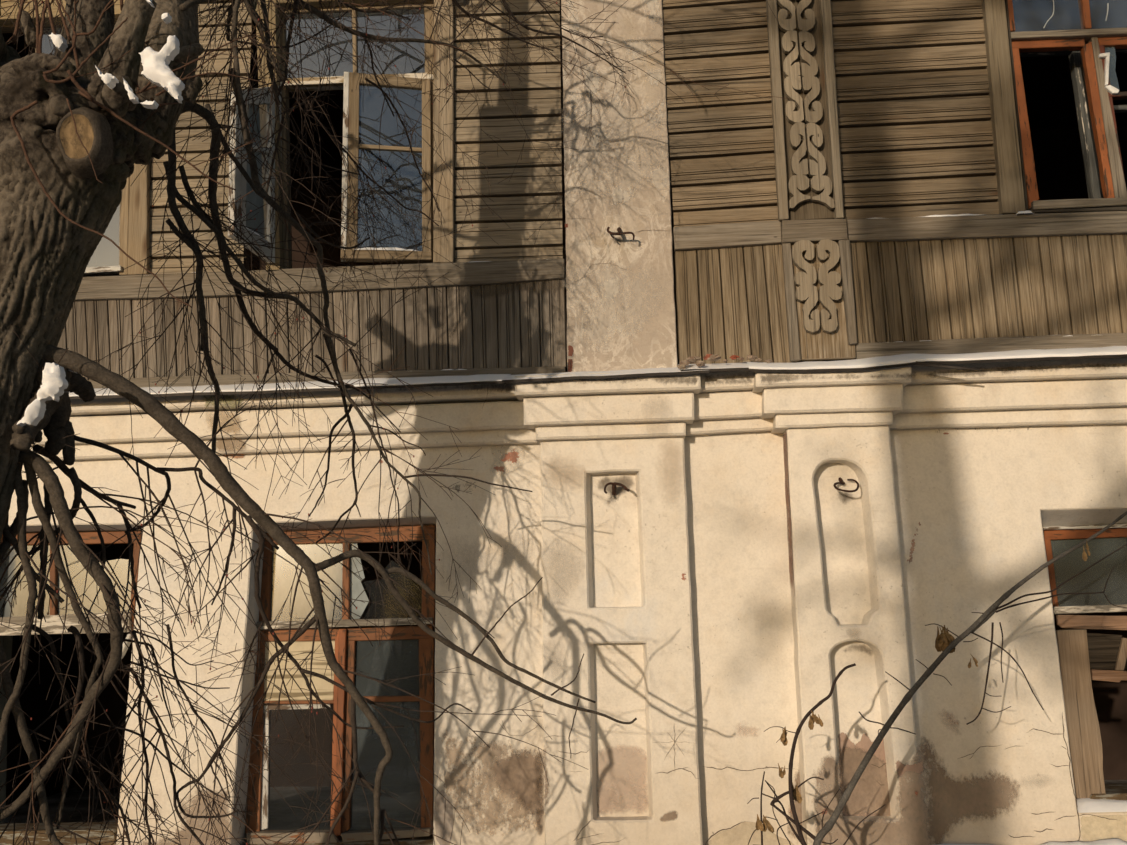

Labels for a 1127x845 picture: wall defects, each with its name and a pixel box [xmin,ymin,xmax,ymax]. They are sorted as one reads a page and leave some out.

peeling [494,449,519,472]